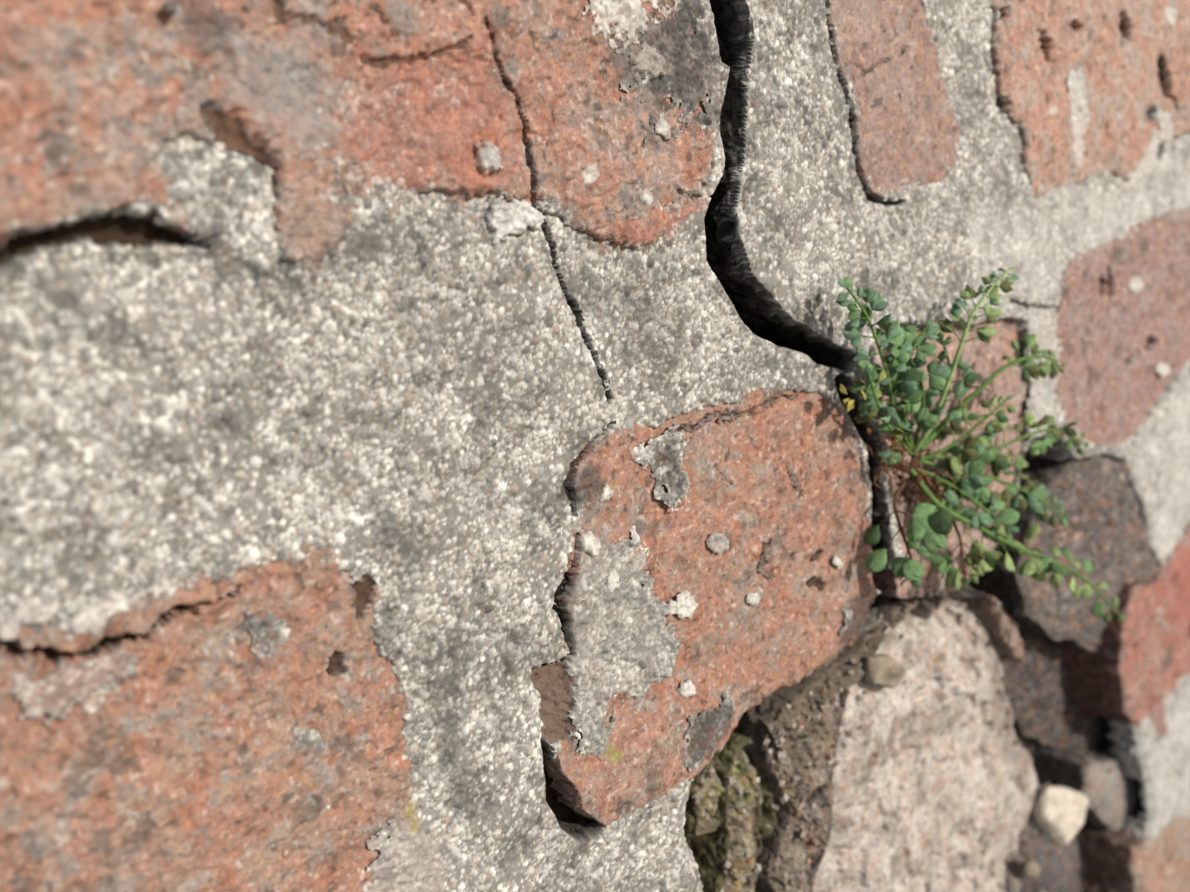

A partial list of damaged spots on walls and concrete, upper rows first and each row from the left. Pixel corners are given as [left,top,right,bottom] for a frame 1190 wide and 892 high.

spalling [157,9,171,26]
spalling [200,106,273,165]
spalling [312,9,534,228]
spalling [595,187,715,259]
crack [667,0,885,550]
crack [272,0,612,674]
crack [0,586,238,663]
spalling [352,574,374,618]
spalling [806,578,825,591]
spalling [328,651,347,676]
spalling [530,657,577,745]
crack [543,767,591,826]